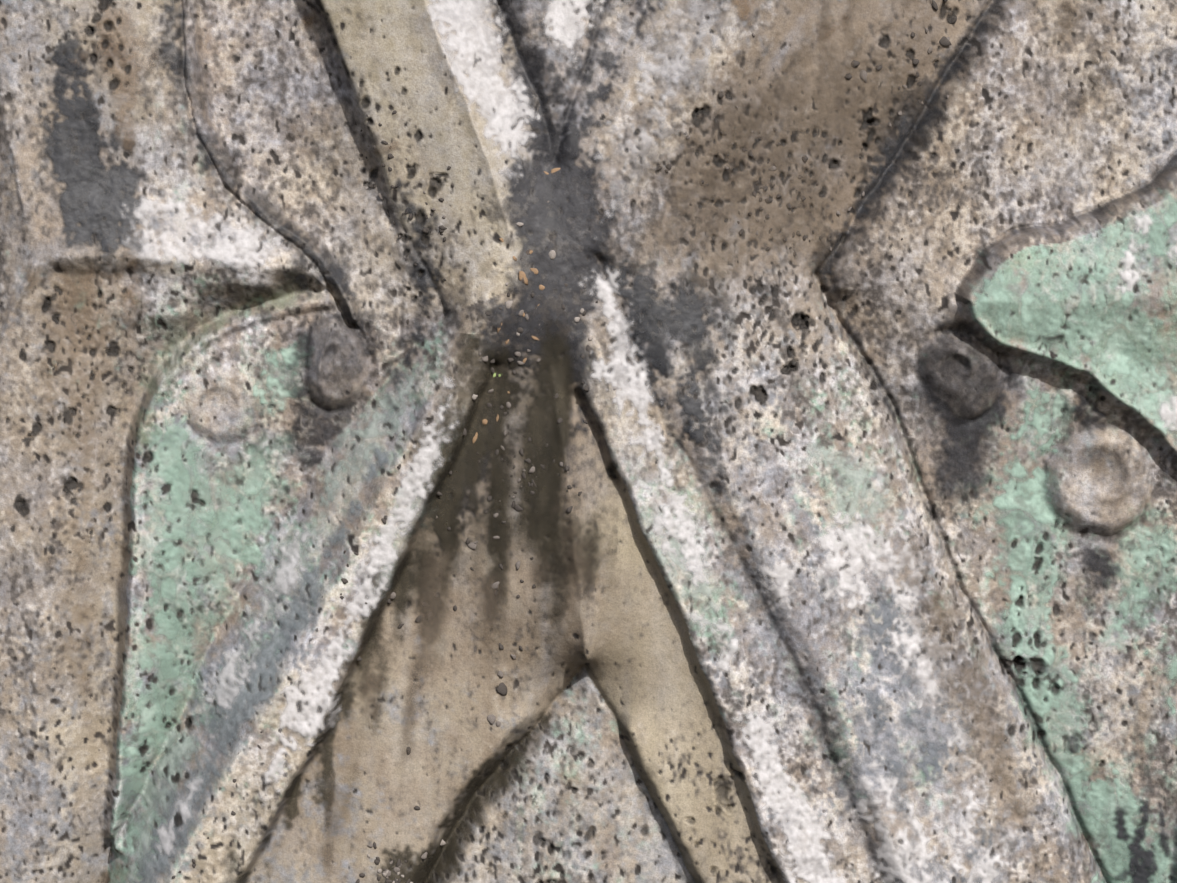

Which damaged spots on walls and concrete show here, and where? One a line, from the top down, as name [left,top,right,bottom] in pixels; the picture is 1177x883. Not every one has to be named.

damp [817,8,998,279]
damp [284,0,734,828]
damp [862,357,899,415]
damp [380,713,552,883]